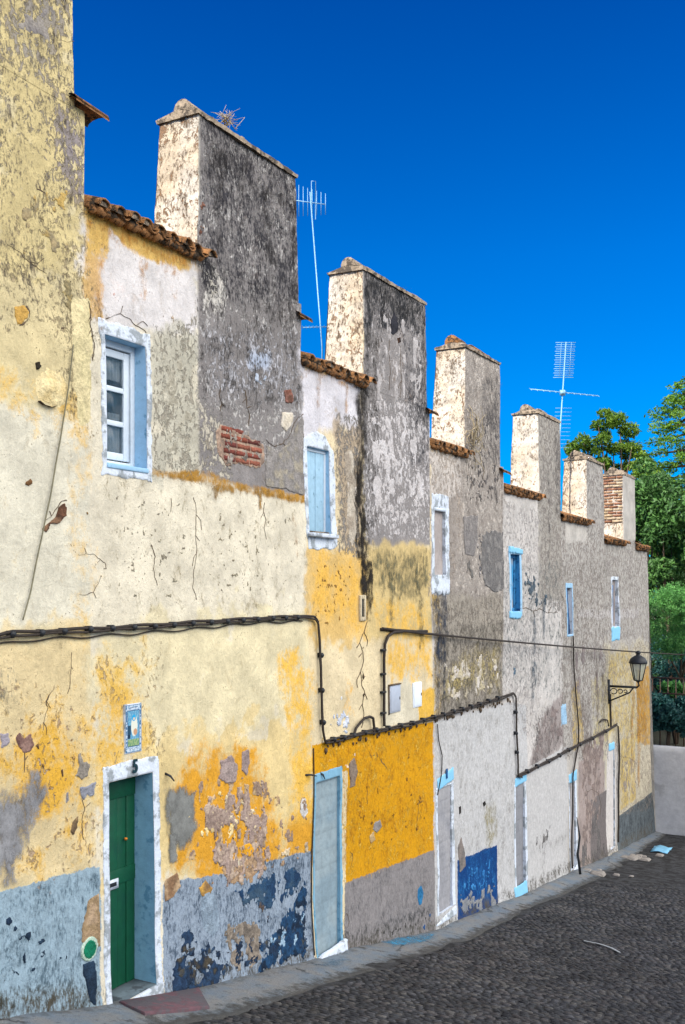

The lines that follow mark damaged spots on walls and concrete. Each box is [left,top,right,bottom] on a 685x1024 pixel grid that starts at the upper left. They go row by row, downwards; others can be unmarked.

water stain [365,275,421,322]
spalling [215,424,265,469]
flaking render [42,503,67,532]
crack [171,497,202,600]
water stain [354,387,447,699]
crack [356,621,368,728]
peeling [164,873,181,901]
peeling [172,777,309,992]
peeling [458,837,496,914]
peeling [83,961,97,1005]